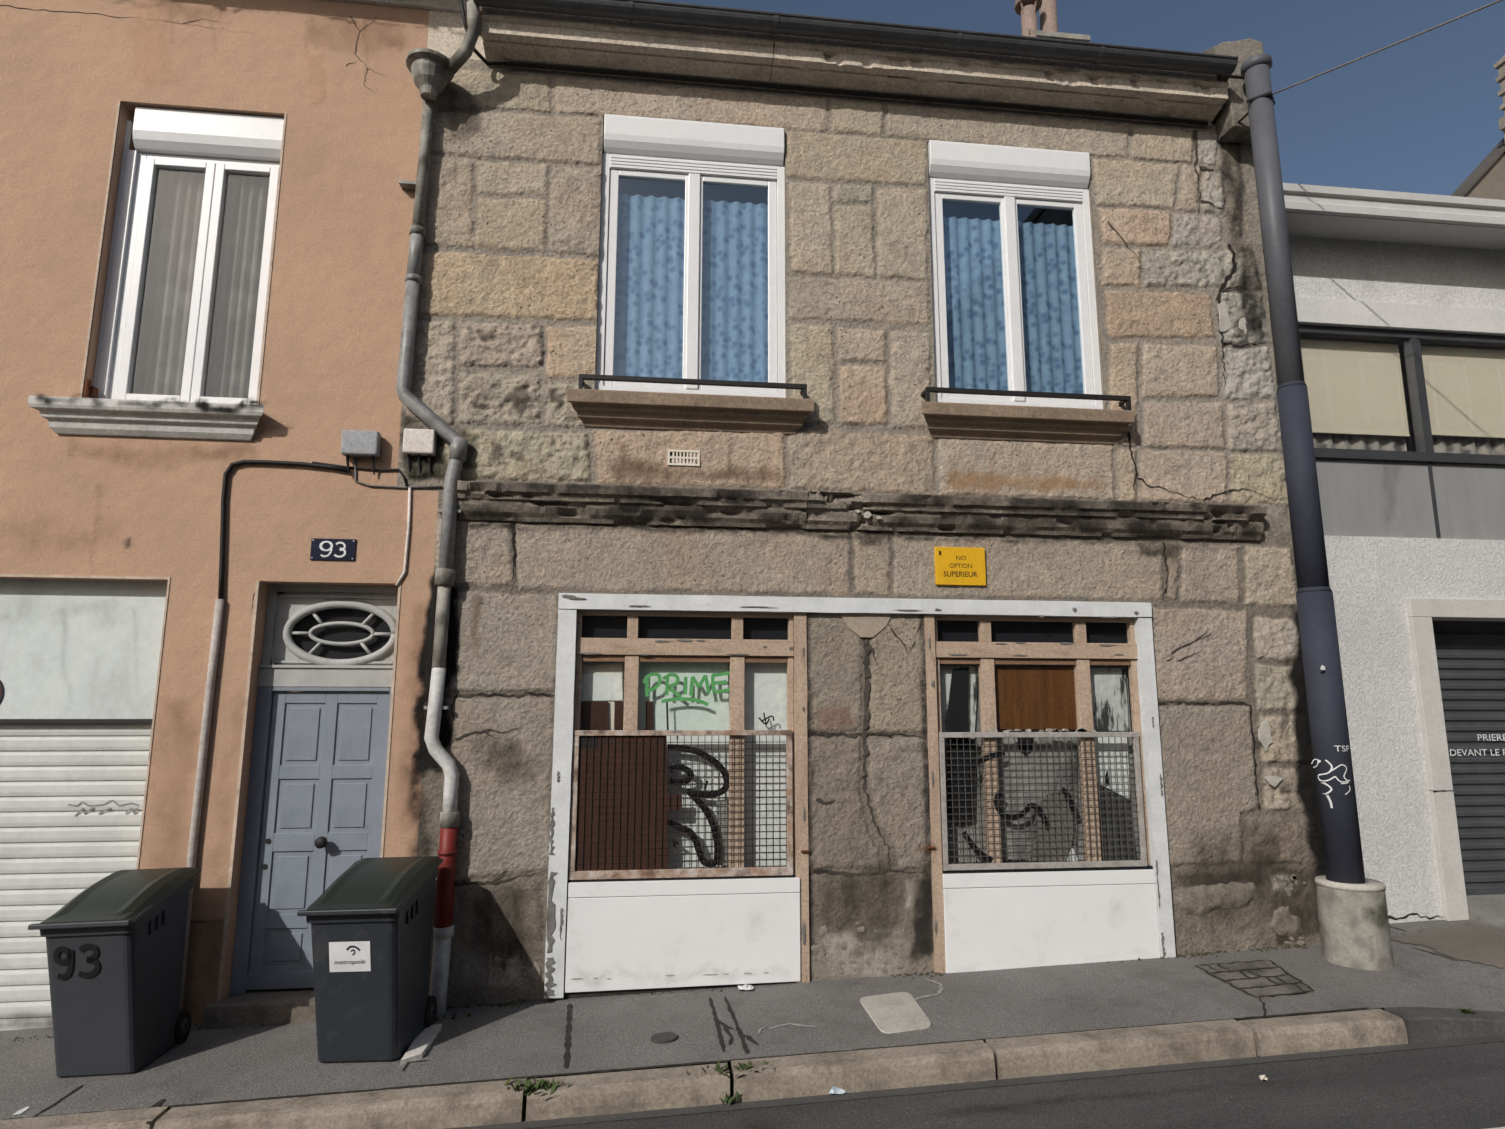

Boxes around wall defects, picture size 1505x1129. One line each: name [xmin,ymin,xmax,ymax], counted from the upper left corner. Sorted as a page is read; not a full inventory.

crack [346,15,382,93]
crack [1193,130,1260,384]
water stain [1223,143,1261,335]
crack [1127,432,1273,501]
water stain [410,575,458,856]
crack [808,619,925,877]
peeling [544,807,611,996]